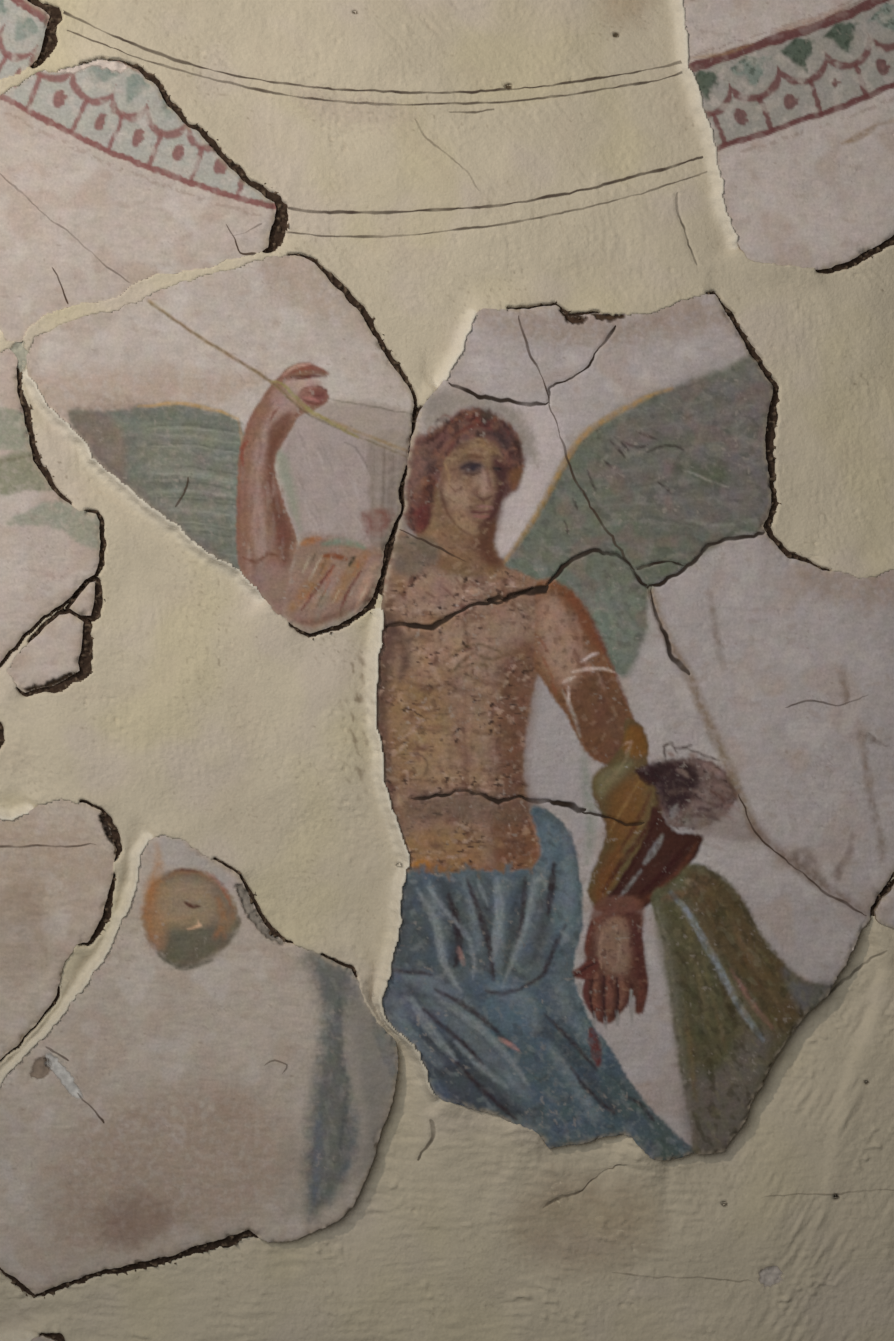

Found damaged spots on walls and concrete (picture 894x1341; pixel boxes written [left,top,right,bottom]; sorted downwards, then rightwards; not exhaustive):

peeling [48,60,127,73]
spalling [560,310,624,324]
crack [27,0,829,675]
crack [0,368,107,697]
spalling [26,673,75,691]
crack [0,722,8,749]
crack [413,790,644,826]
spalling [100,815,117,852]
crack [738,794,894,916]
spalling [236,884,283,944]
peeling [30,1054,82,1098]